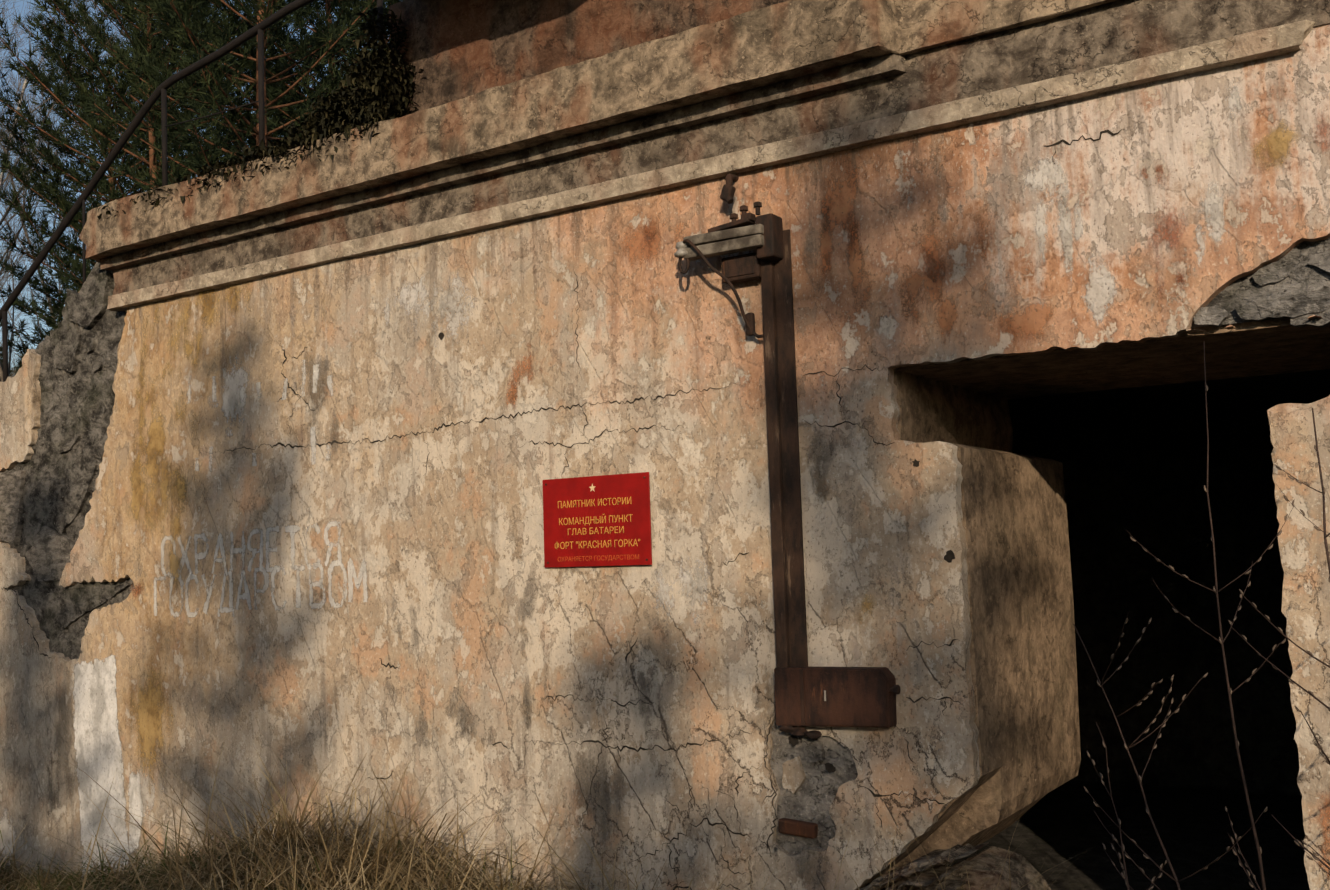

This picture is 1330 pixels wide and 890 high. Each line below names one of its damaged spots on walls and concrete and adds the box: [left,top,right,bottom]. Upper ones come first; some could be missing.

crack [1047,129,1124,165]
spalling [1191,237,1330,328]
crack [200,265,763,476]
spalling [0,262,135,660]
crack [492,638,778,890]
spalling [770,718,858,855]
crack [855,740,947,829]
crack [906,697,961,715]